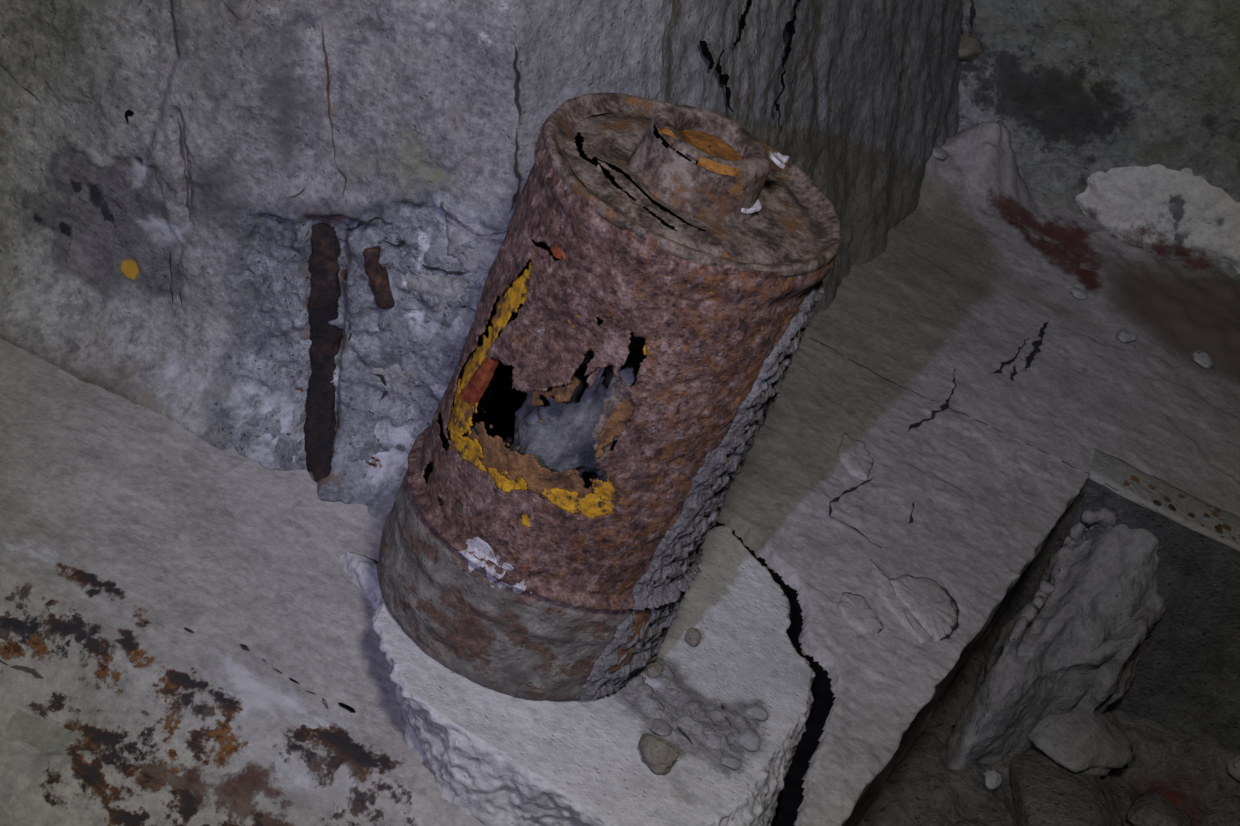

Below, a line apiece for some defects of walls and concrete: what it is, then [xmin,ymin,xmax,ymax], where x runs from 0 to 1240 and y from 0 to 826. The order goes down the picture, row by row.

crack [699,0,752,112]
crack [774,0,801,131]
corrosion [315,214,351,290]
corrosion [989,189,1102,290]
corrosion [1112,228,1210,270]
spalling [209,192,508,515]
corrosion [1124,475,1240,540]
corrosion [0,563,416,826]
crack [709,521,836,826]